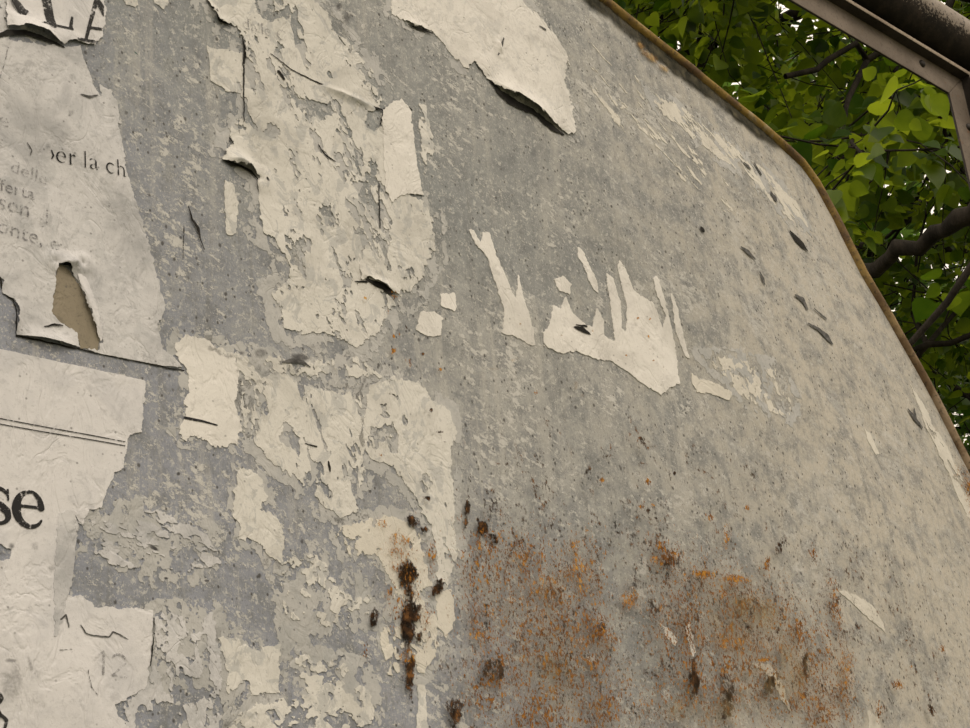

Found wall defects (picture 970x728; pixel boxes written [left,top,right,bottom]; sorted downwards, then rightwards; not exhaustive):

corrosion [370,420,947,728]